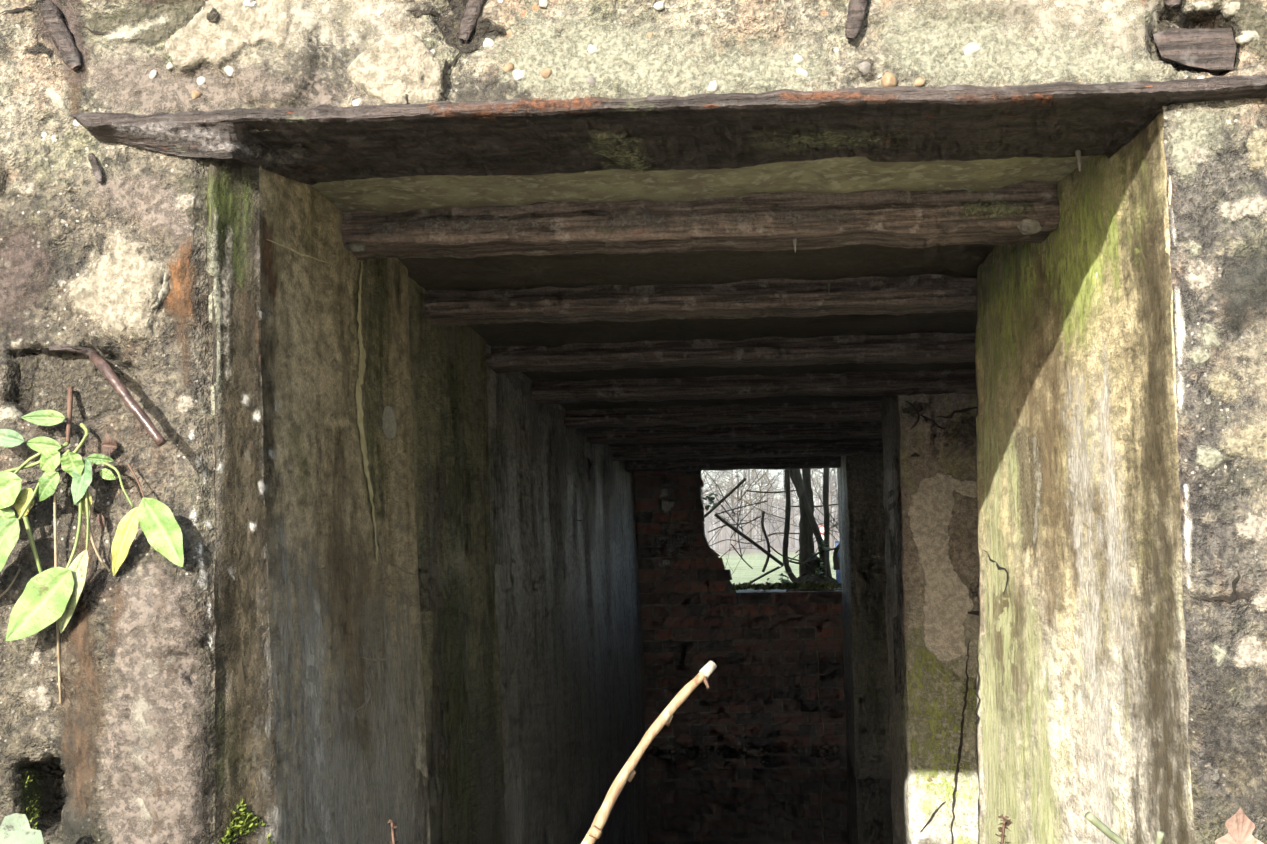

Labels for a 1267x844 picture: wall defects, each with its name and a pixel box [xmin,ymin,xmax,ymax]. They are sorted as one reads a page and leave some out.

rust [165,250,192,382]
water stain [1017,219,1042,235]
water stain [196,216,454,844]
flaking render [908,472,979,663]
crack [920,611,980,844]
crack [983,550,1008,594]
water stain [993,591,1023,696]
water stain [1024,110,1267,844]